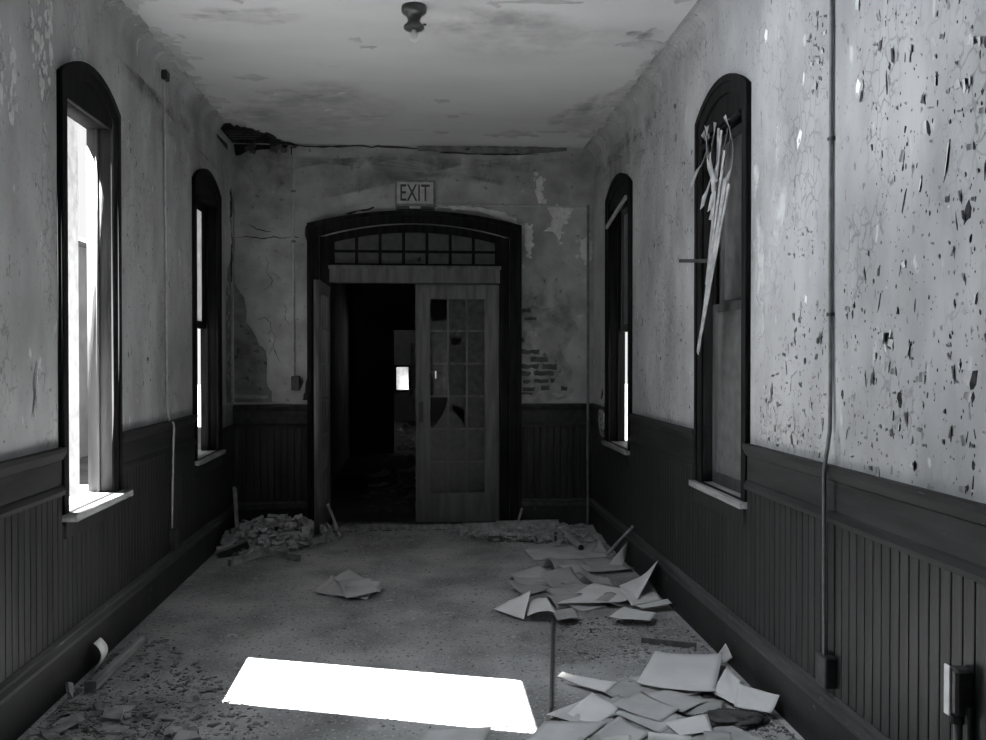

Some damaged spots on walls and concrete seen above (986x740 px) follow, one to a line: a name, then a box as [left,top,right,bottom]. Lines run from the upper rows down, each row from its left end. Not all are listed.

peeling [0,21,18,126]
peeling [30,0,53,102]
peeling [148,27,298,154]
peeling [486,0,590,9]
peeling [854,0,986,230]
peeling [435,171,573,259]
flaking render [222,276,274,428]
peeling [843,241,920,392]
peeling [841,271,986,496]